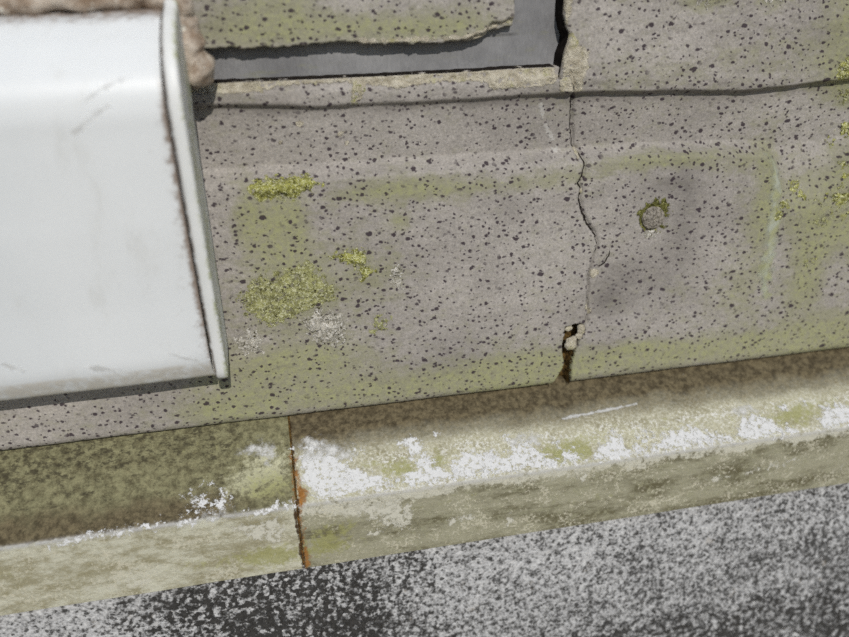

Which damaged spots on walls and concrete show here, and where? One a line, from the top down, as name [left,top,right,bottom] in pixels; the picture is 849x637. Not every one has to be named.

crack [553,0,610,315]
leakage [562,403,637,419]
corrosion [290,450,311,568]